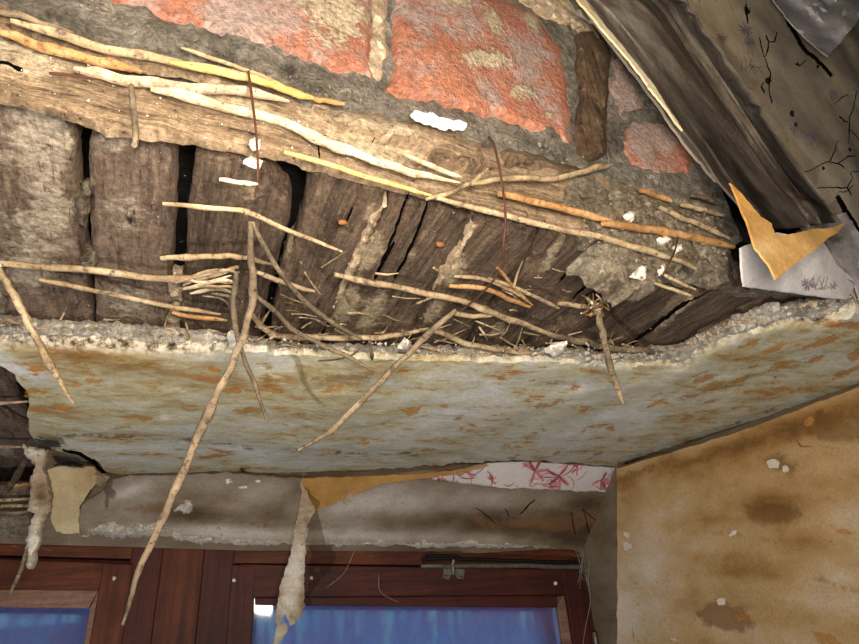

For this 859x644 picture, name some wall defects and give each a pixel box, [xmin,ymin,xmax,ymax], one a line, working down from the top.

crack [745,0,833,103]
peeling [243,138,263,169]
peeling [518,0,845,280]
crack [806,92,859,232]
spalling [0,296,851,363]
peeling [273,480,315,644]